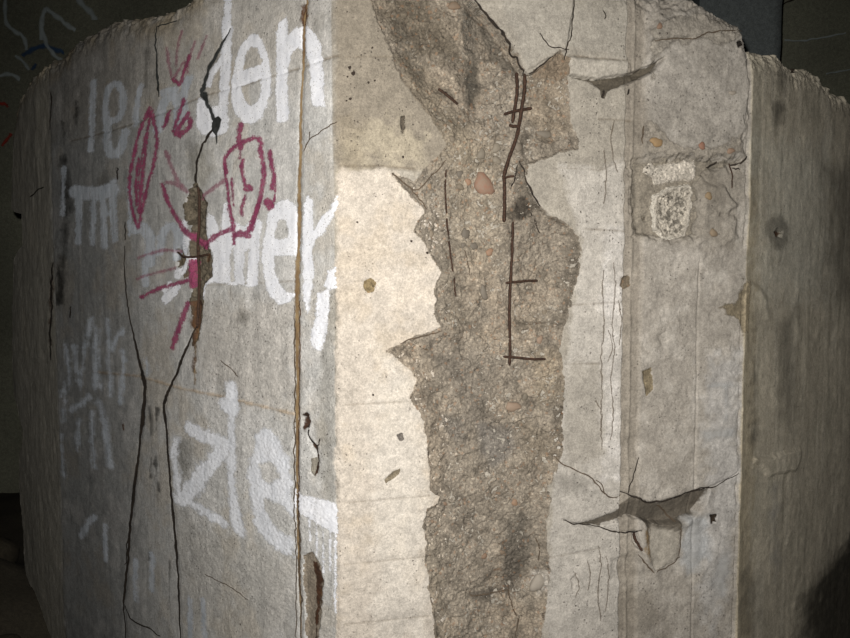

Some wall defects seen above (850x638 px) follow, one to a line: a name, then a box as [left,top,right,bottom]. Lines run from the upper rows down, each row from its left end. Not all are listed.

crack [154,20,177,97]
crack [194,28,231,187]
spalling [175,182,213,346]
rust [293,0,311,638]
spalling [370,0,743,638]
crack [123,223,197,638]
spalling [311,457,319,476]
spalling [303,552,324,638]